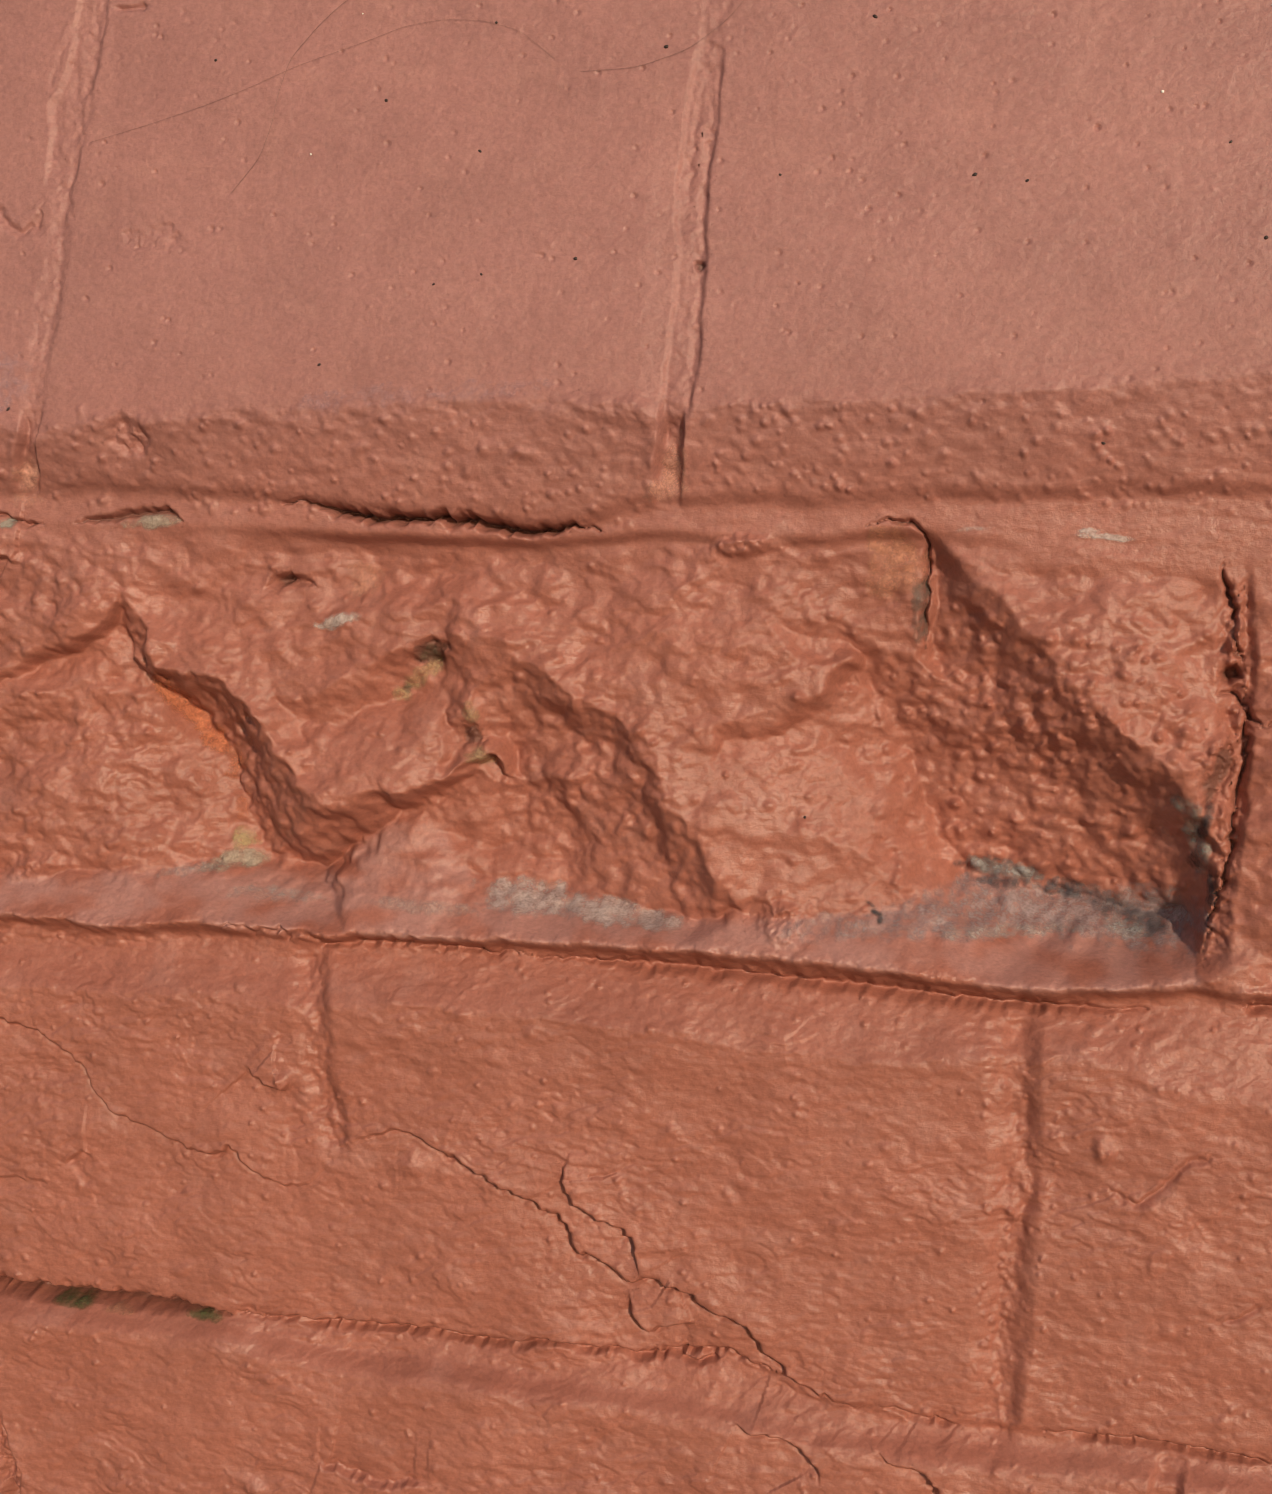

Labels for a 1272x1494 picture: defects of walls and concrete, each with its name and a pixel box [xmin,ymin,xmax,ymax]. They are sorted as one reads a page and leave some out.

peeling [0,197,50,244]
crack [0,502,188,570]
crack [278,493,605,542]
crack [861,512,938,655]
crack [1199,558,1272,966]
leakage [882,798,1216,947]
crack [1095,1150,1224,1215]
crack [0,1014,964,1494]
crack [1216,1300,1270,1329]
crack [1039,1426,1272,1470]